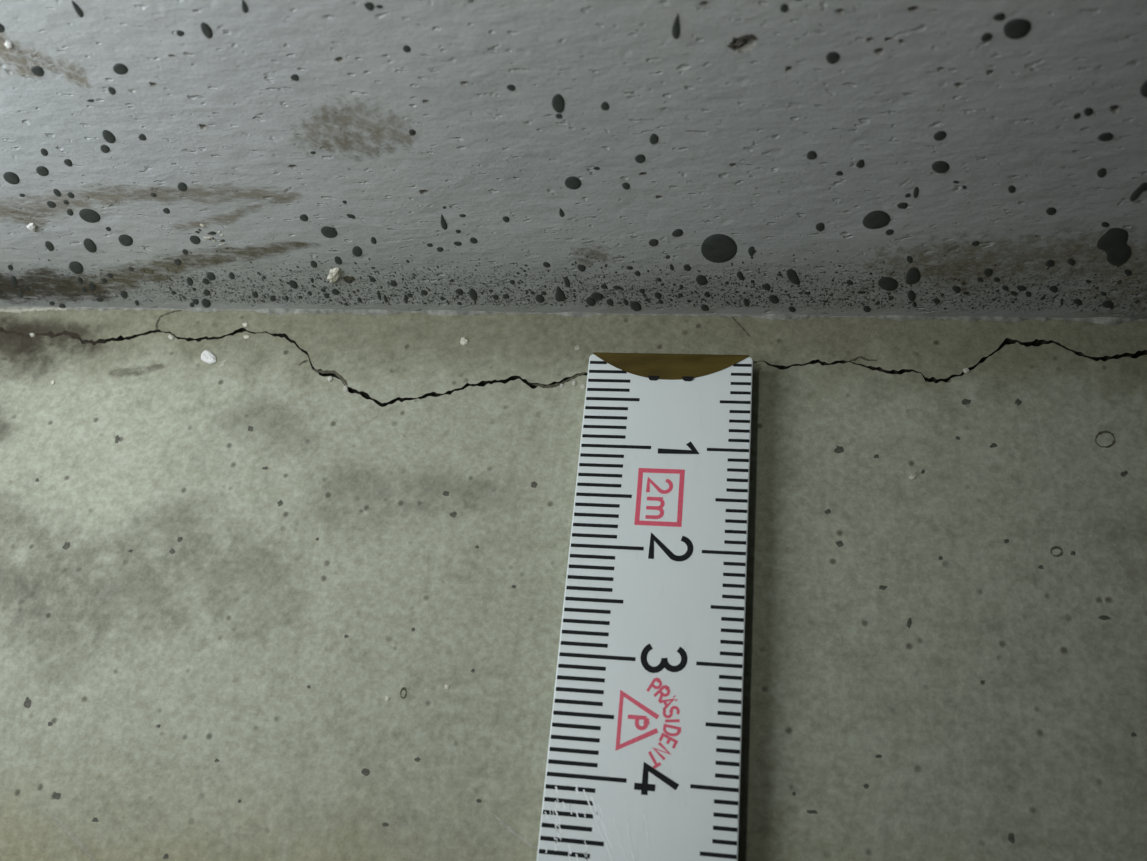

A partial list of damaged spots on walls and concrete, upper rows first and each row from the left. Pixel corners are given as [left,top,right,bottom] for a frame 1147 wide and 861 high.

leakage [0,242,308,304]
leakage [0,324,95,366]
crack [0,310,588,407]
crack [732,317,1147,383]